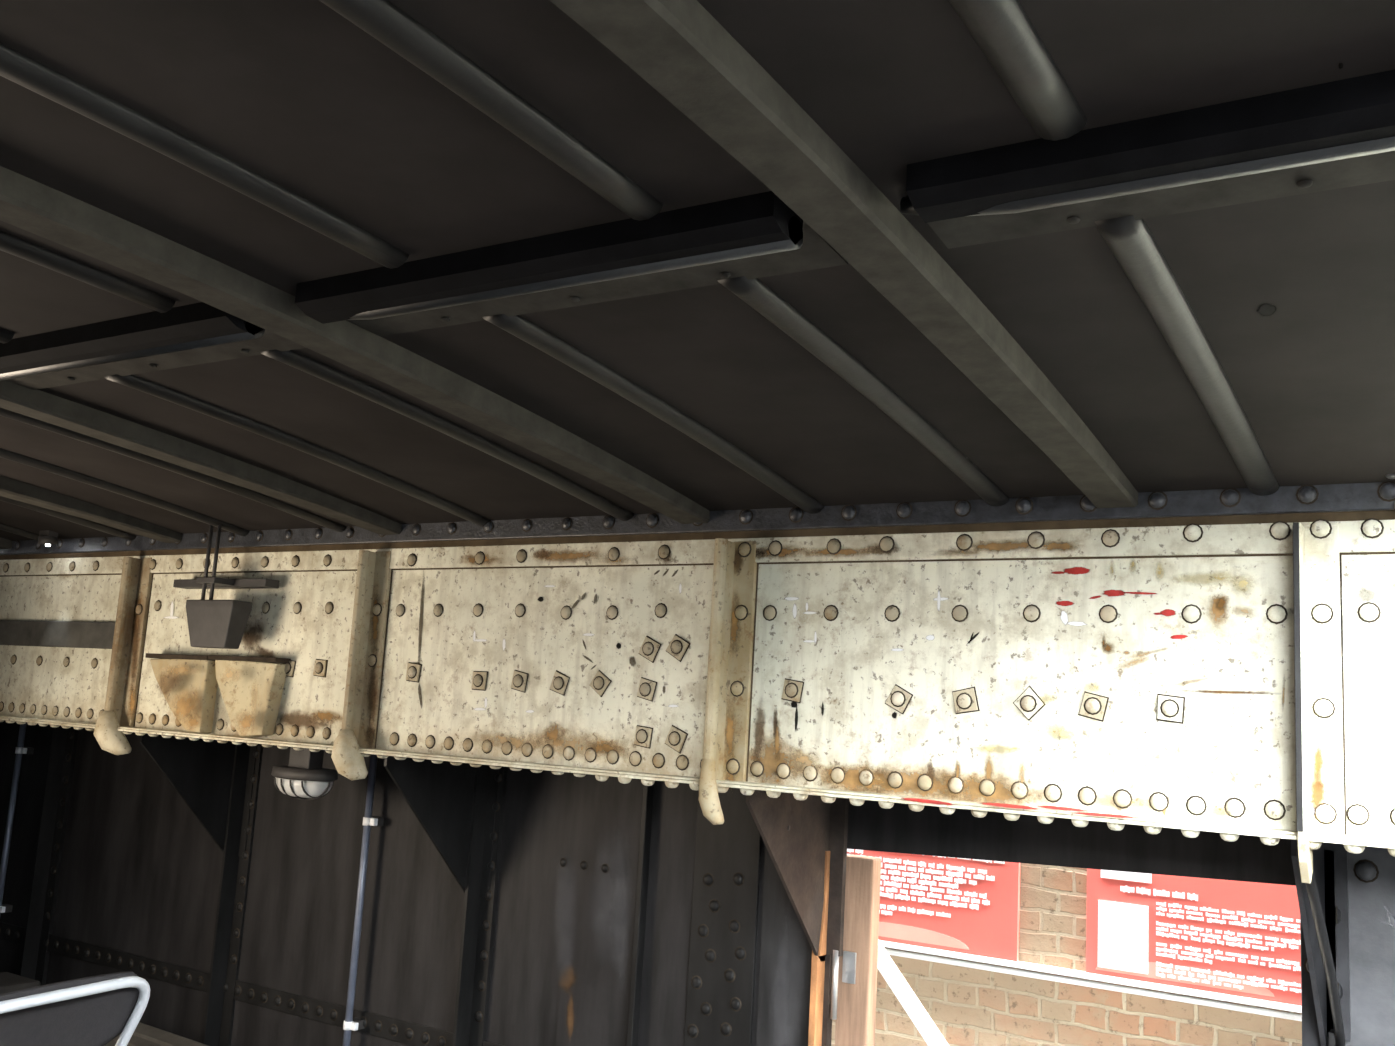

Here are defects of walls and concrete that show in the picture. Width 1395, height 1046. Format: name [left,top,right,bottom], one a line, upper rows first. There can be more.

corrosion [730,599,739,651]
corrosion [1211,597,1250,623]
corrosion [157,667,199,728]
corrosion [277,712,341,728]
corrosion [491,724,623,754]
corrosion [726,709,1041,804]
corrosion [1309,740,1325,811]